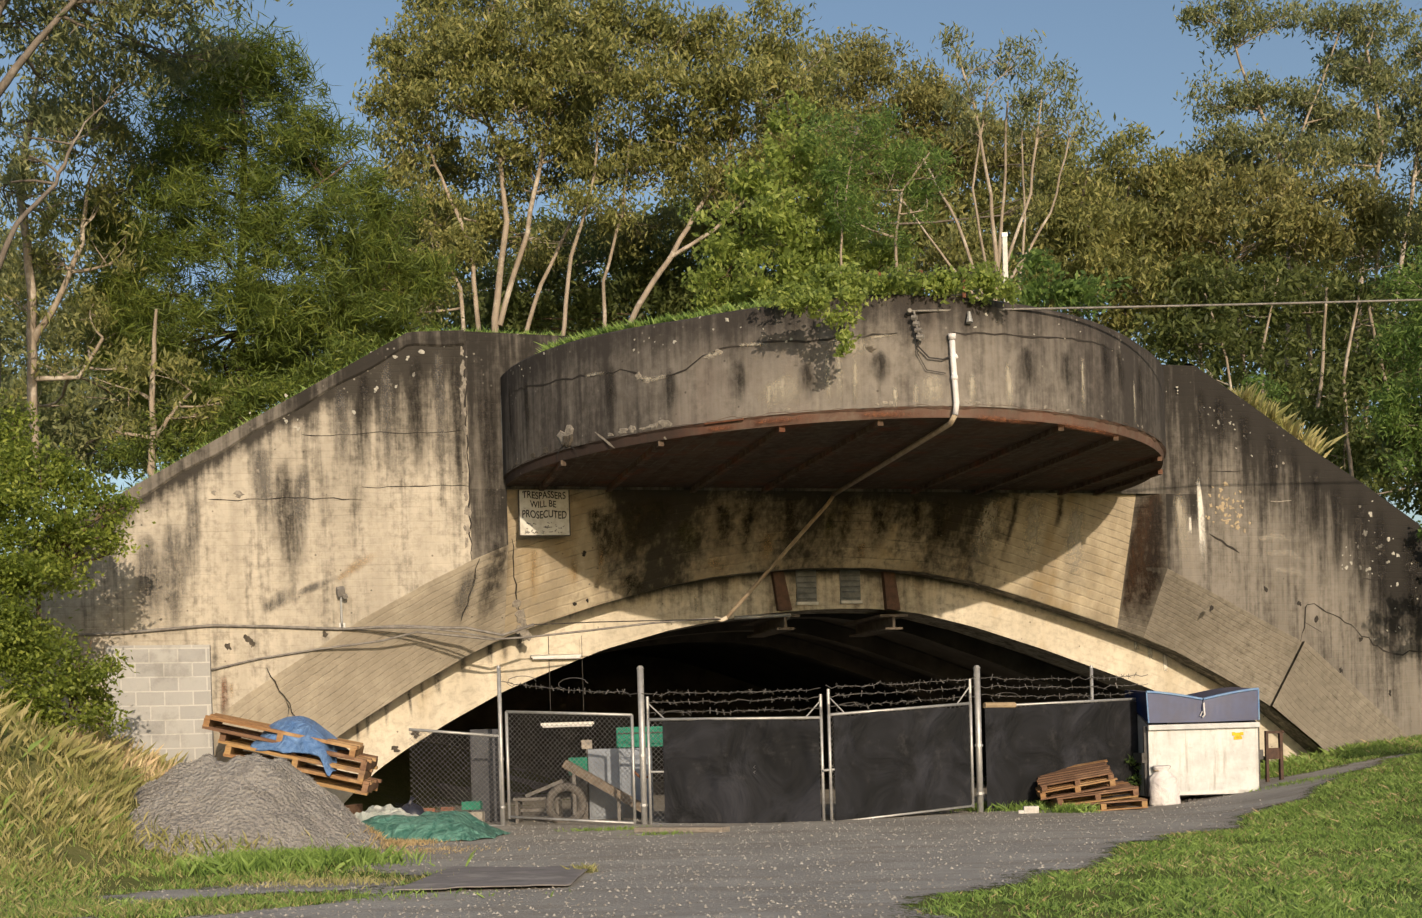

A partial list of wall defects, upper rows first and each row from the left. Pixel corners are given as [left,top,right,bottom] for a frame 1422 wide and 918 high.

crack [512,333,897,392]
crack [953,332,1114,350]
leakage [140,501,198,612]
leakage [255,453,307,556]
leakage [717,506,754,545]
leakage [977,499,1082,566]
leakage [1124,483,1205,607]
crack [1301,603,1422,656]
crack [267,669,295,716]